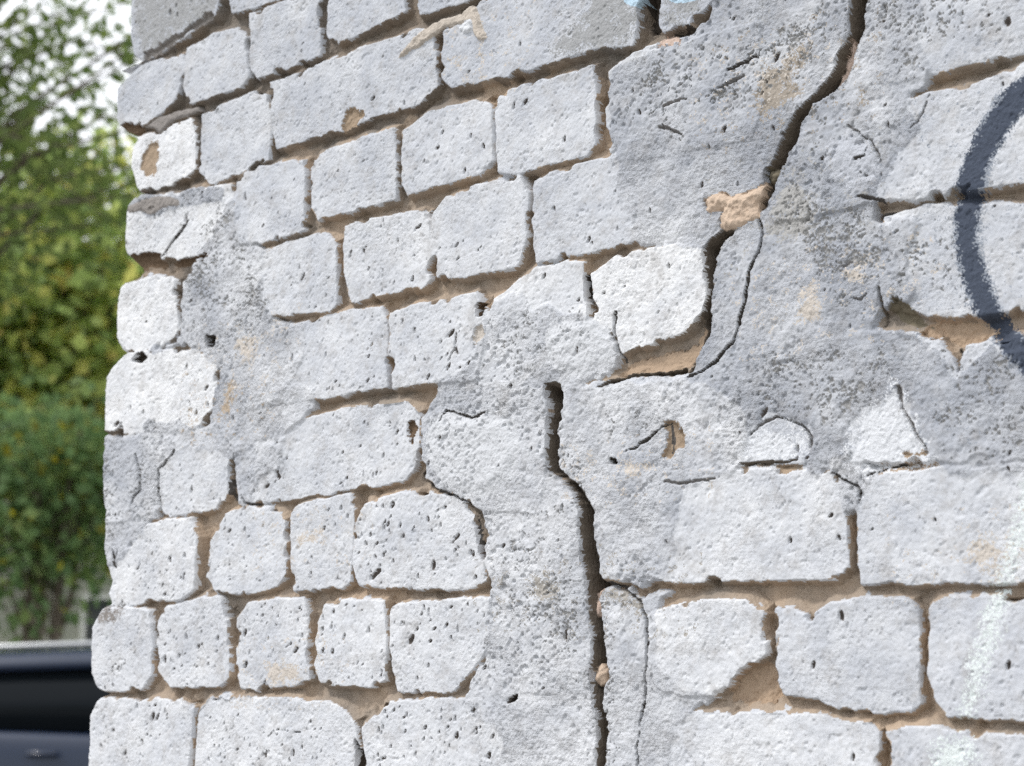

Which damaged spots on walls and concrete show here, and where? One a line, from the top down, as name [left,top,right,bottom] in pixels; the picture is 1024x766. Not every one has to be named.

peeling [120,107,206,177]
spalling [341,107,365,134]
crack [597,0,868,387]
crack [161,220,189,256]
crack [629,423,676,454]
crack [739,415,814,466]
crack [831,384,929,501]
crack [544,381,650,766]